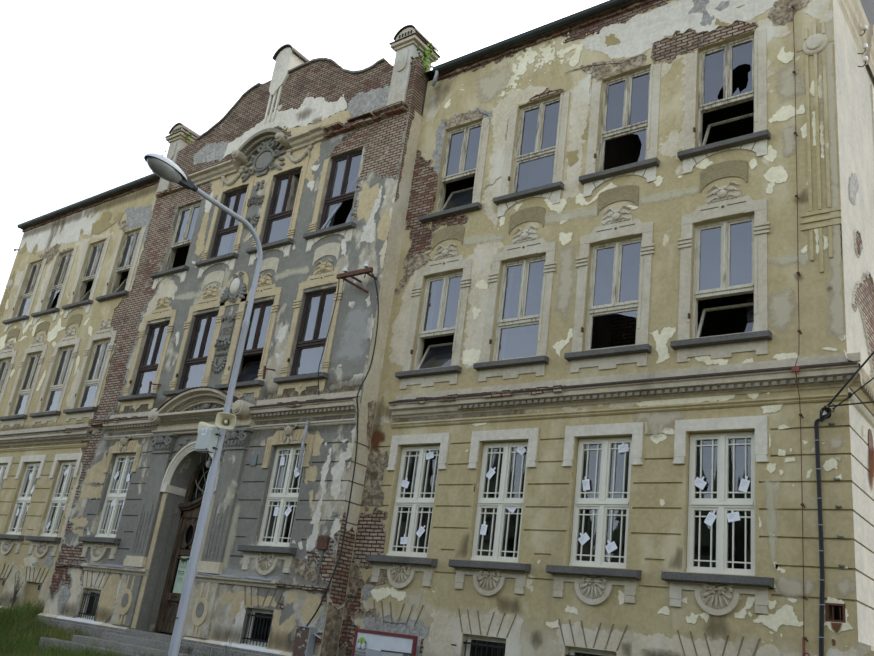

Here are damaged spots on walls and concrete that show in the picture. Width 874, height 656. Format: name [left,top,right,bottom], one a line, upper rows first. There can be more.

peeling [425,0,833,369]
peeling [0,207,128,350]
flaking render [43,94,469,626]
flaking render [852,271,874,381]
peeling [651,427,675,444]
peeling [598,395,735,408]
peeling [747,392,783,414]
peeling [766,424,795,475]
flaking render [221,400,543,656]
flaking render [546,584,803,656]
peeling [814,597,857,656]